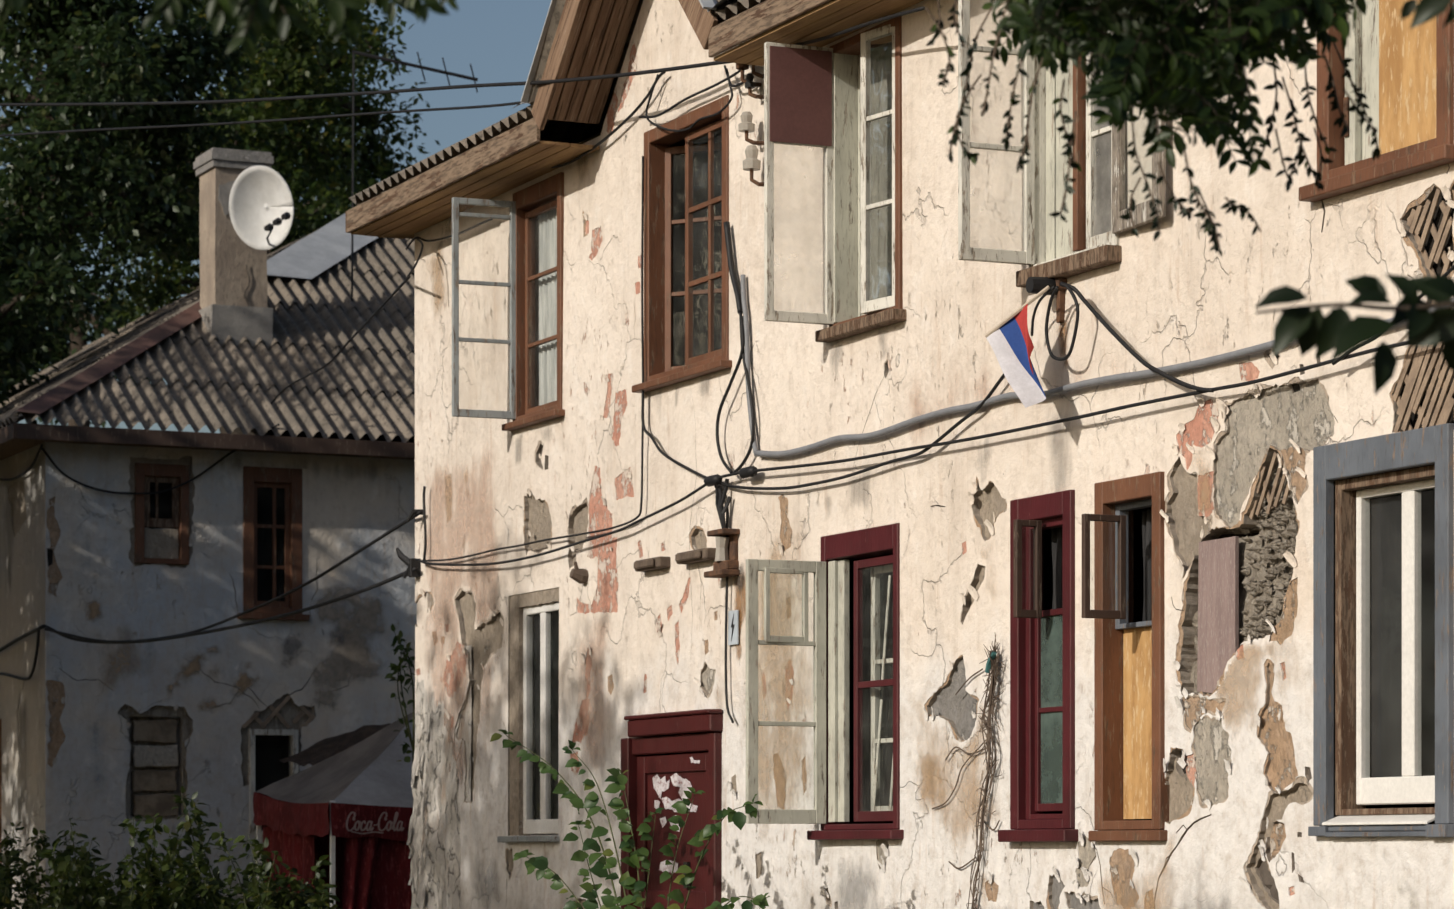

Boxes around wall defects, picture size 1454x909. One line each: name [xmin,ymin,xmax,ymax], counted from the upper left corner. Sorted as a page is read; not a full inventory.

peeling [7,480,27,537]
peeling [45,496,63,597]
peeling [523,466,634,614]
peeling [960,477,1007,625]
peeling [655,577,690,665]
flaking render [1159,348,1335,909]
flaking render [240,693,316,787]
peeling [415,588,504,803]
peeling [923,654,979,742]
peeling [820,886,838,909]
peeling [1030,829,1155,909]